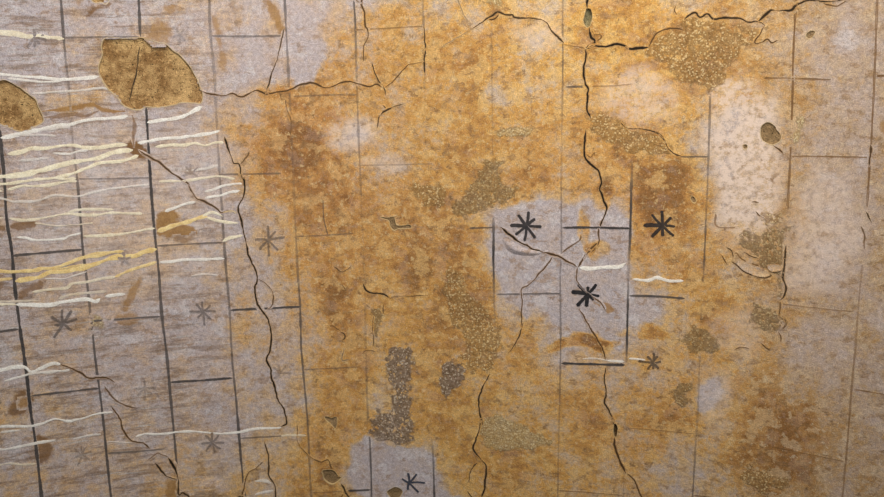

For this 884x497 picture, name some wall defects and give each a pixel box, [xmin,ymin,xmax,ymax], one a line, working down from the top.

flaking render [0,79,44,132]
efflorescence [0,142,149,203]
flaking render [98,37,204,111]
flaking render [602,13,771,96]
flaking render [759,122,781,145]
water stain [0,247,225,308]
crack [138,136,352,497]
water stain [135,0,604,497]
crack [202,0,856,497]
water stain [398,0,884,497]
crack [859,211,872,250]
crack [60,363,192,497]